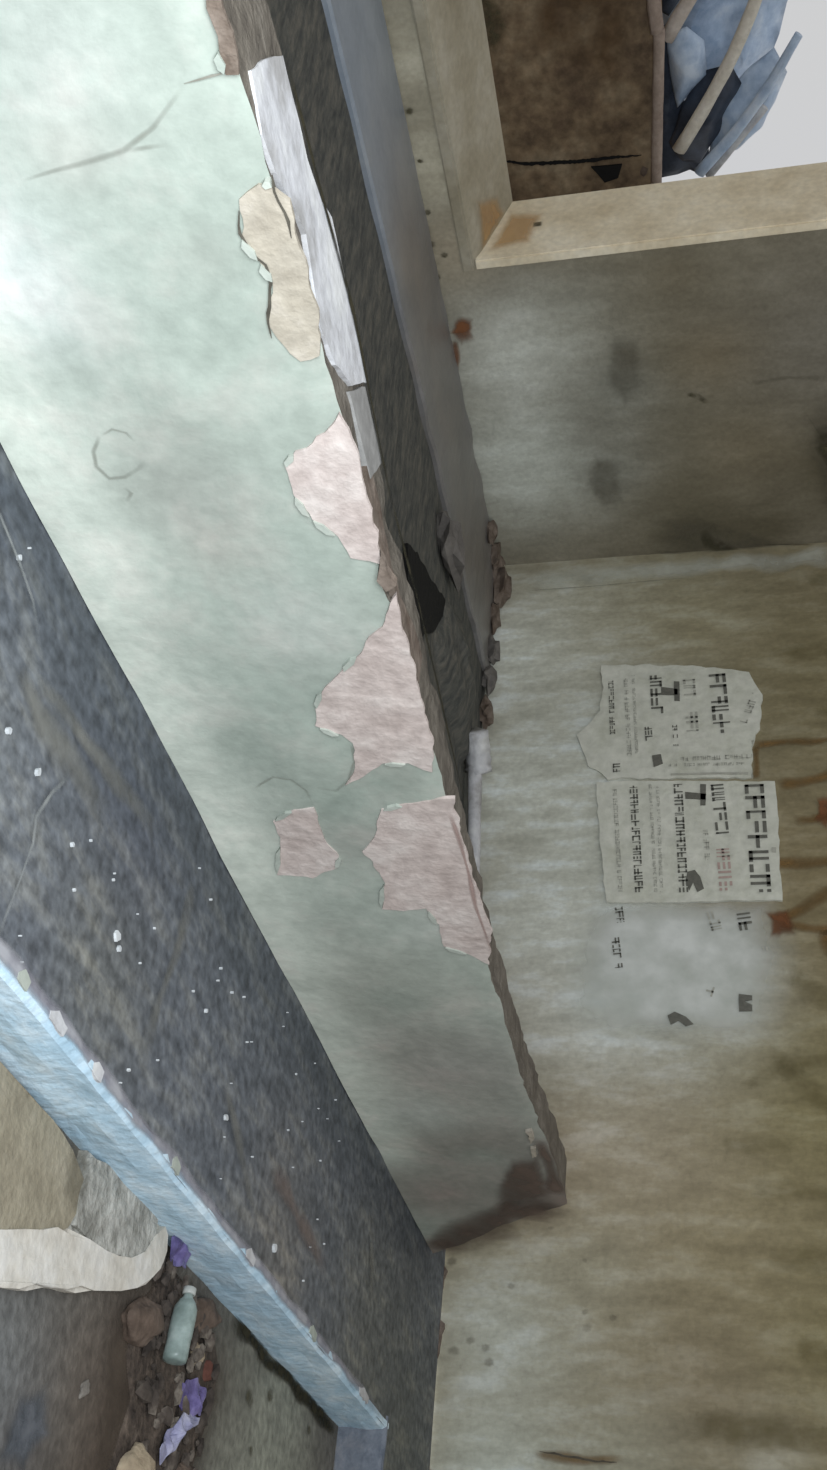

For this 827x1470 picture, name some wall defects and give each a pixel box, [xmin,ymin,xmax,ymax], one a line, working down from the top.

crack [184,73,222,84]
rust [484,204,541,244]
spalling [206,0,446,785]
rust [755,739,827,776]
rust [805,799,827,825]
peeling [273,807,341,878]
peeling [362,795,493,964]
rust [770,907,827,946]
damp [433,1145,564,1250]